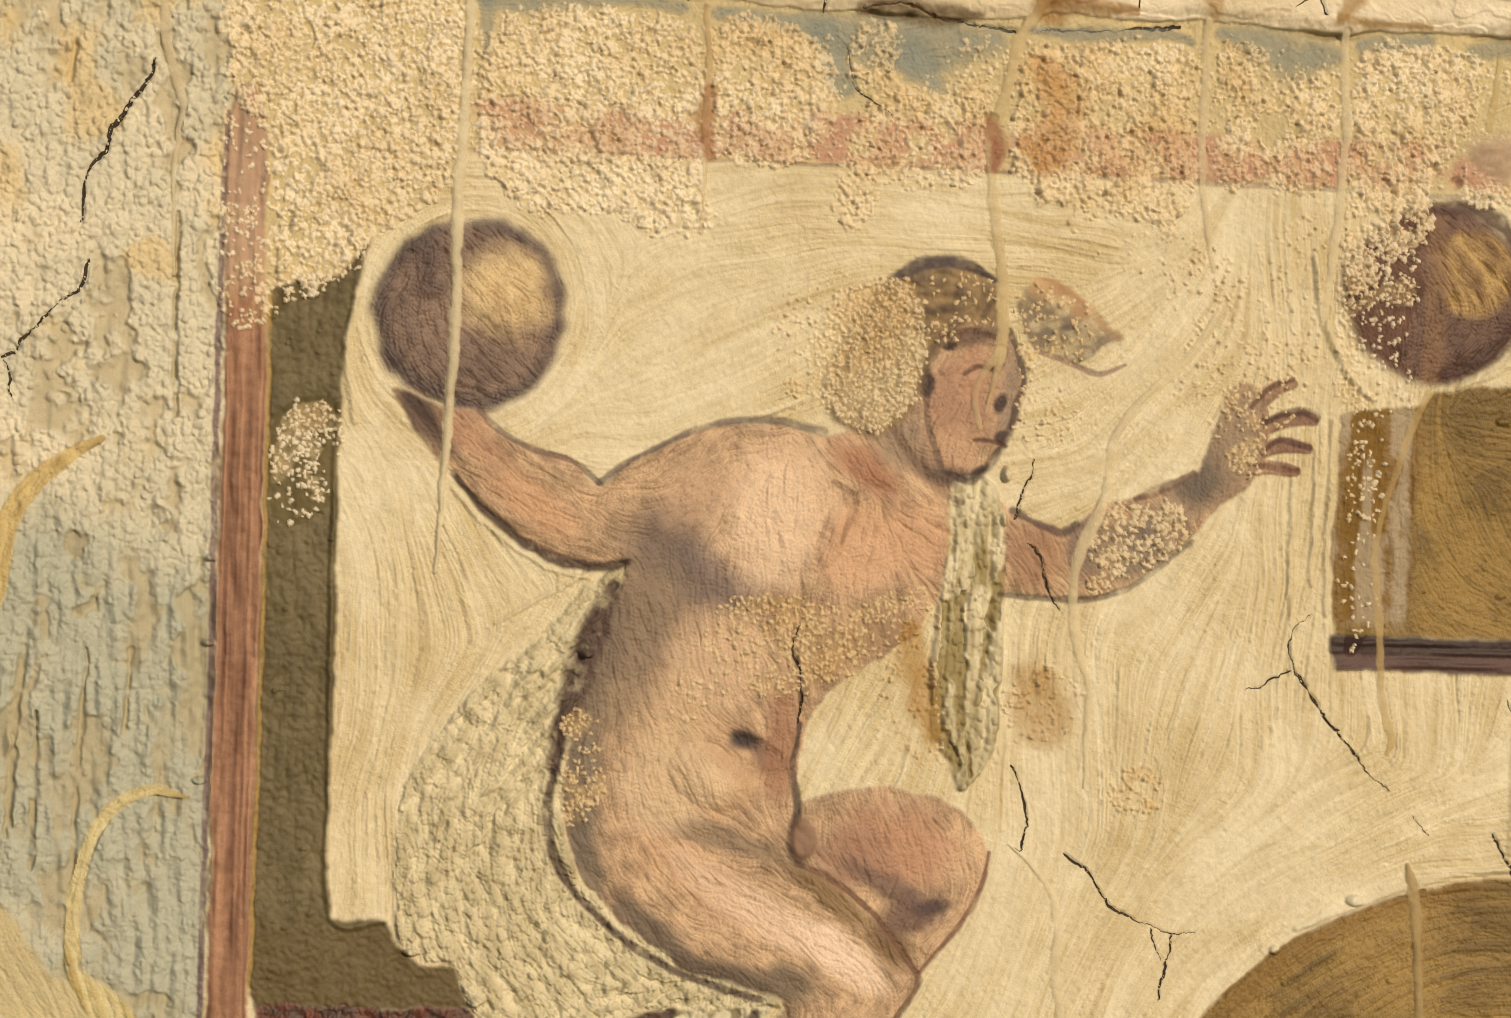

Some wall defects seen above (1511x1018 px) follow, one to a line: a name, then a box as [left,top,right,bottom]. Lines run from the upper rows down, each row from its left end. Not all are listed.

crack [80,57,156,223]
crack [1,258,90,397]
crack [1246,614,1429,836]
crack [1010,765,1029,852]
crack [1063,853,1195,1000]
crack [1492,834,1511,875]